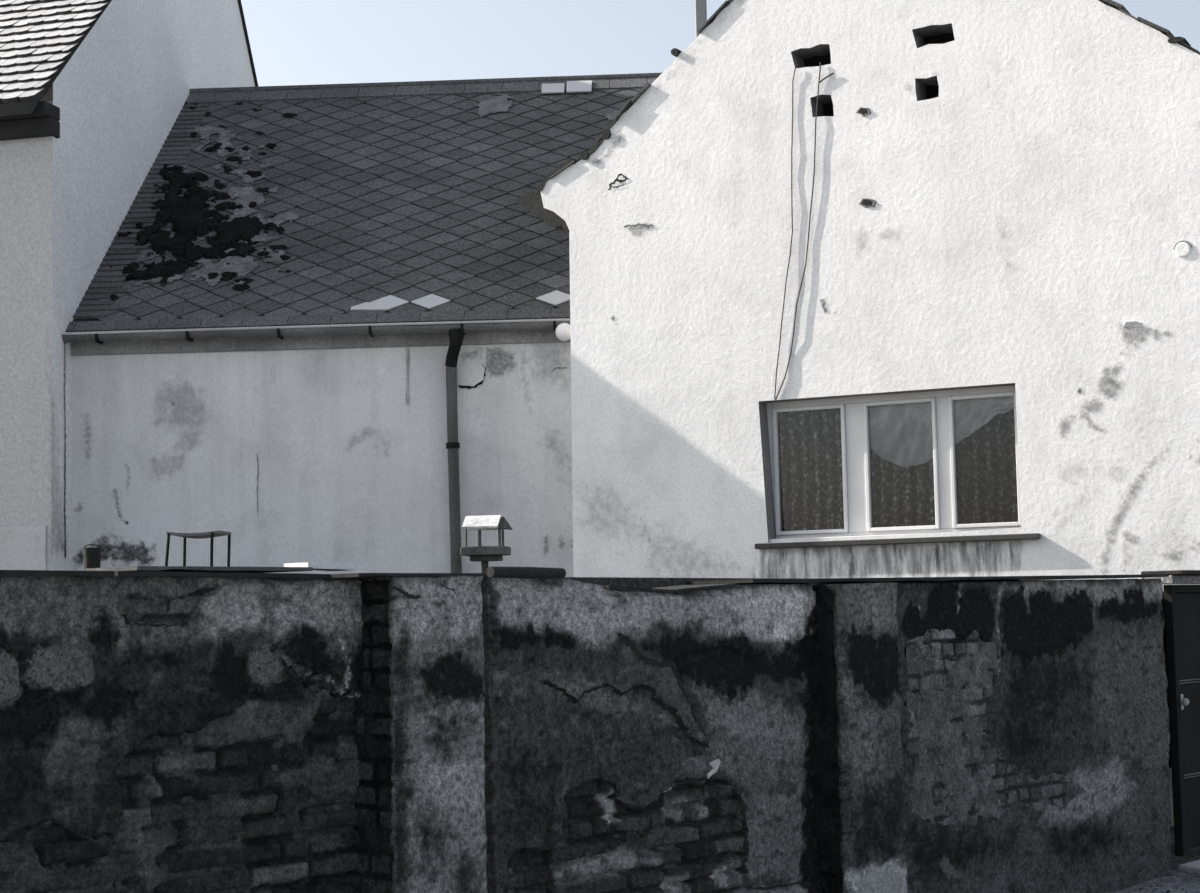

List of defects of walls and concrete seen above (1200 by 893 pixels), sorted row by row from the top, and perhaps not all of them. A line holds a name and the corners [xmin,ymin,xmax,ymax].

crack [458,367,486,389]
damp [0,675,138,745]
damp [89,609,121,655]
spalling [0,641,363,893]
damp [287,624,364,700]
damp [499,624,576,650]
crack [543,633,709,748]
damp [643,603,824,893]
peeling [905,628,1084,827]
damp [844,541,1165,762]
spalling [503,759,746,893]
crack [568,777,819,890]